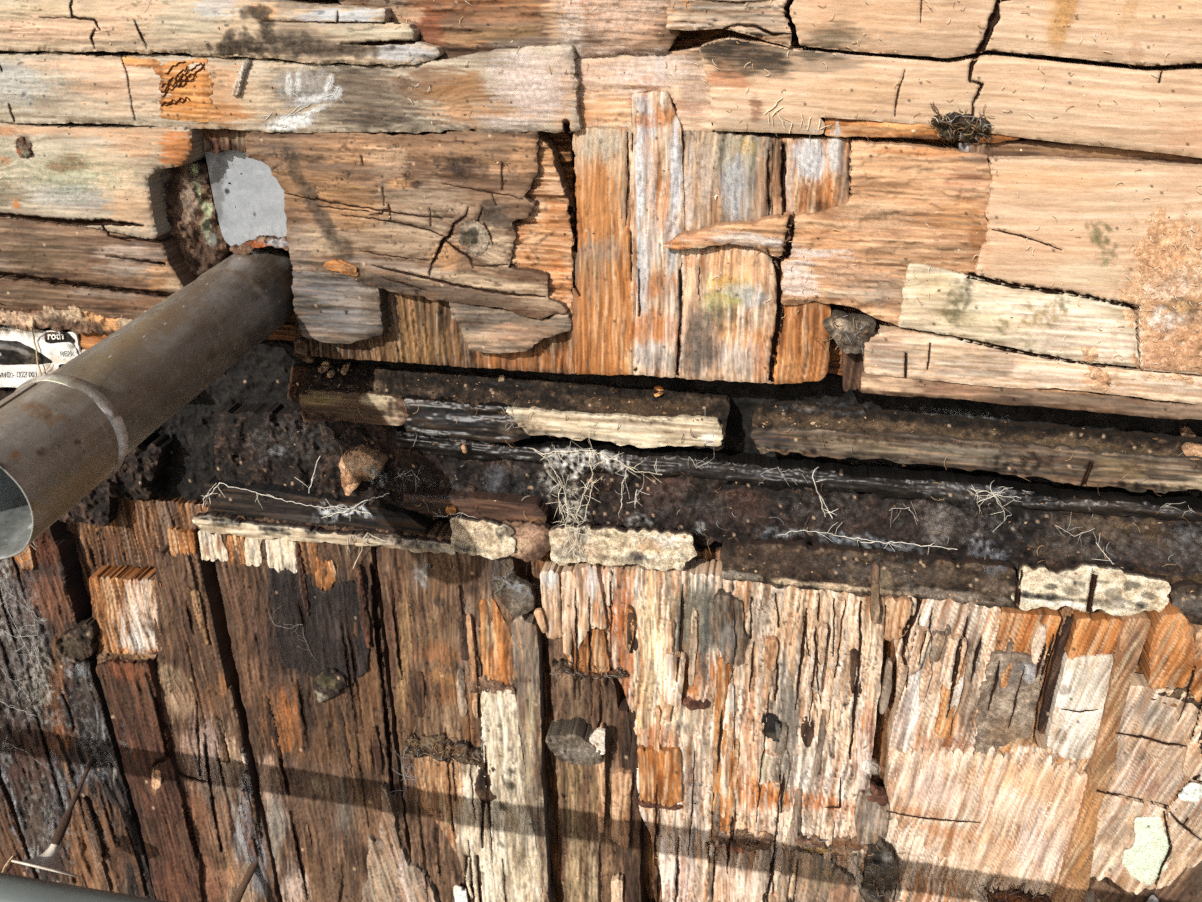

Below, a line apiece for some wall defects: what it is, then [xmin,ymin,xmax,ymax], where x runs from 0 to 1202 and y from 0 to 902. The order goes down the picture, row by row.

crack [708,0,941,116]
crack [968,0,1202,119]
crack [284,163,545,297]
crack [563,123,580,295]
crack [766,144,793,381]
crack [339,565,403,828]
crack [419,668,506,902]
peeling [1122,815,1171,886]
peeling [1178,782,1202,803]